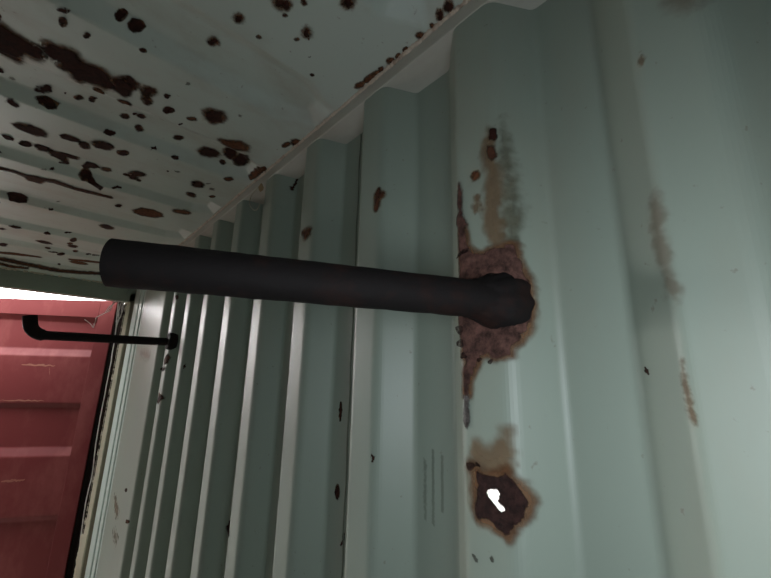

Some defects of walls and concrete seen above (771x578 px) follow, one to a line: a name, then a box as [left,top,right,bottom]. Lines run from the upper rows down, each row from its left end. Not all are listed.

rust [272,0,307,17]
rust [294,27,312,41]
rust [340,0,356,10]
rust [415,0,454,39]
rust [354,46,408,89]
rust [455,128,537,428]
rust [469,440,538,544]